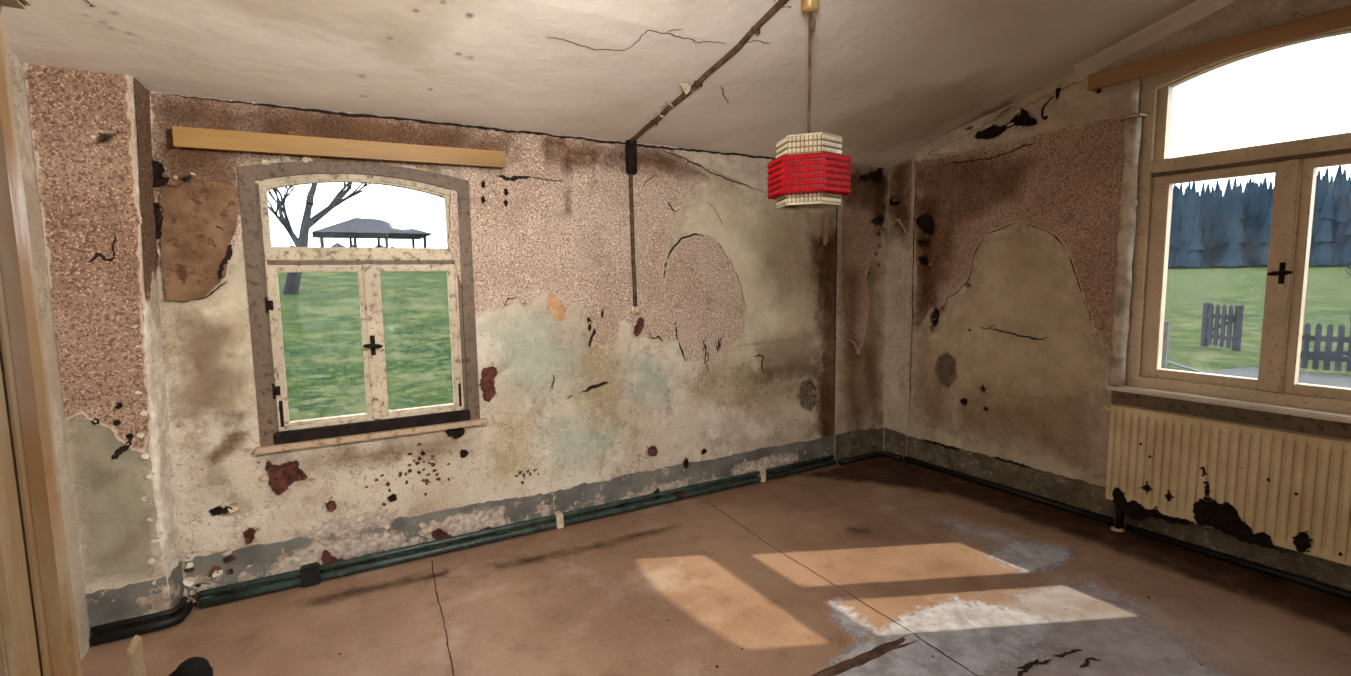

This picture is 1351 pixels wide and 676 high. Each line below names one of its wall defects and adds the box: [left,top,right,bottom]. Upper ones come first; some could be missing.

crack [549,29,769,51]
spalling [90,130,122,142]
peeling [929,67,1142,155]
spalling [151,160,196,239]
spalling [916,210,939,270]
peeling [660,148,829,424]
peeling [930,223,1107,412]
damp [813,456,1351,633]
rust [1112,466,1313,553]
damp [1017,649,1101,676]